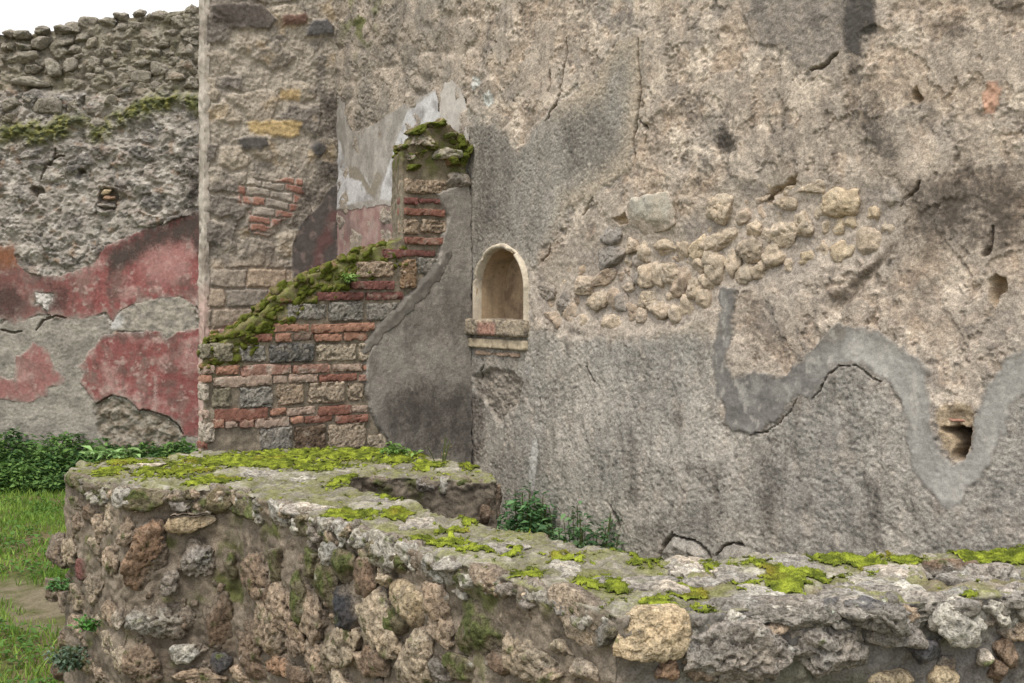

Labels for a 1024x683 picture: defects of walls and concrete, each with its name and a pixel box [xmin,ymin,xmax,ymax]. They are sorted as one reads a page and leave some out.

crack [547,38,569,118]
crack [632,41,649,164]
crack [810,54,838,71]
flaking render [336,80,469,210]
spalling [535,171,912,333]
crack [2,315,66,334]
flaking render [0,212,199,437]
crack [816,364,881,394]
crack [660,532,745,560]